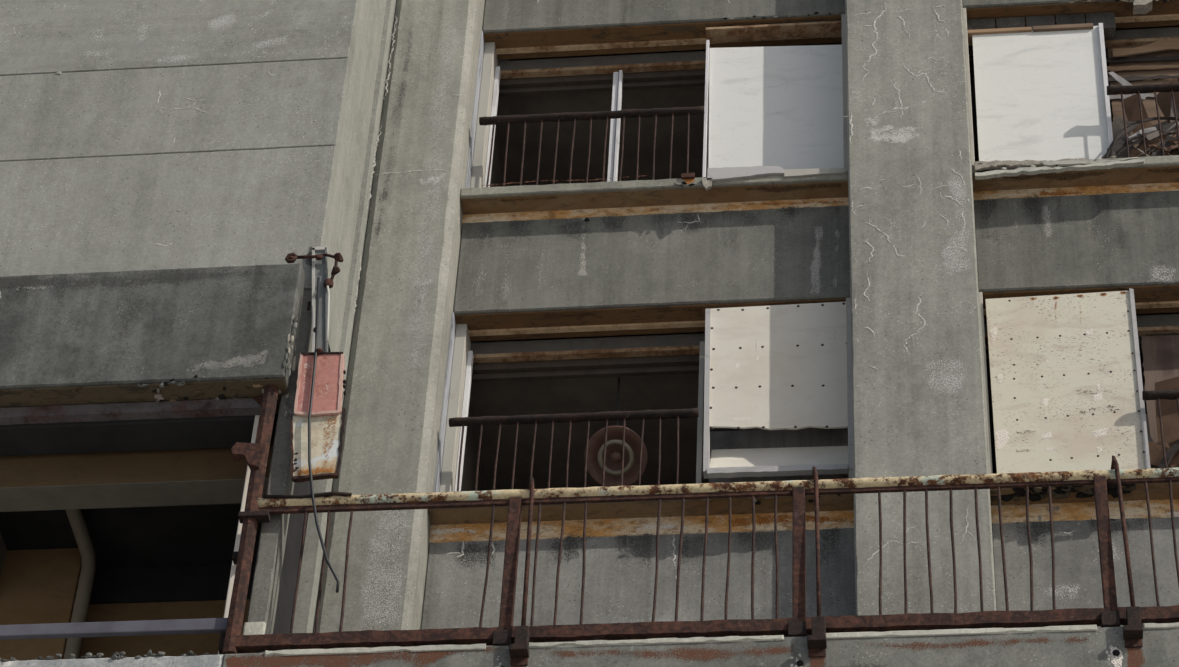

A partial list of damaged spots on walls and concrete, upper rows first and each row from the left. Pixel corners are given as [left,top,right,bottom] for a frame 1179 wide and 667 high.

spalling [967,0,1168,38]
crack [844,3,950,144]
damp [0,265,266,361]
crack [851,149,977,386]
corrosion [225,645,504,667]
corrosion [544,644,795,664]